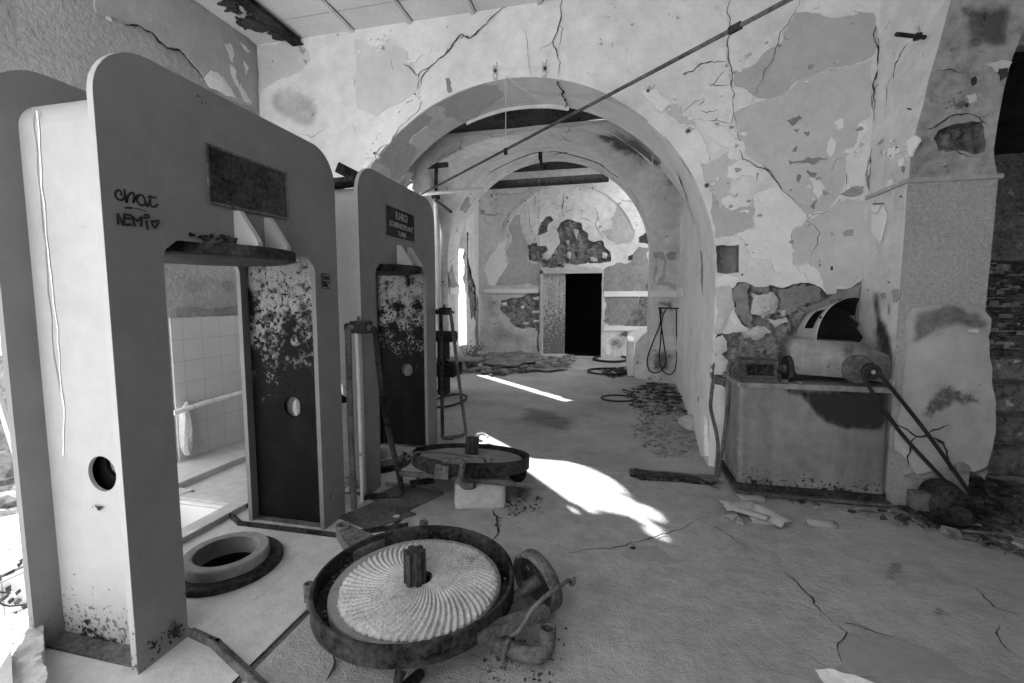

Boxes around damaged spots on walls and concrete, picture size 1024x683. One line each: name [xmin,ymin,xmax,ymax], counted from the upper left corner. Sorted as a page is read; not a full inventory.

crack [125,24,205,81]
flaking render [93,0,310,109]
crack [390,7,505,113]
crack [525,1,571,143]
flaking render [985,60,1012,81]
crack [683,1,829,255]
flaking render [460,196,485,215]
flaking render [642,4,986,387]
flaking render [448,205,676,358]
water stain [916,308,984,338]
water stain [926,386,974,415]
crack [784,572,895,662]